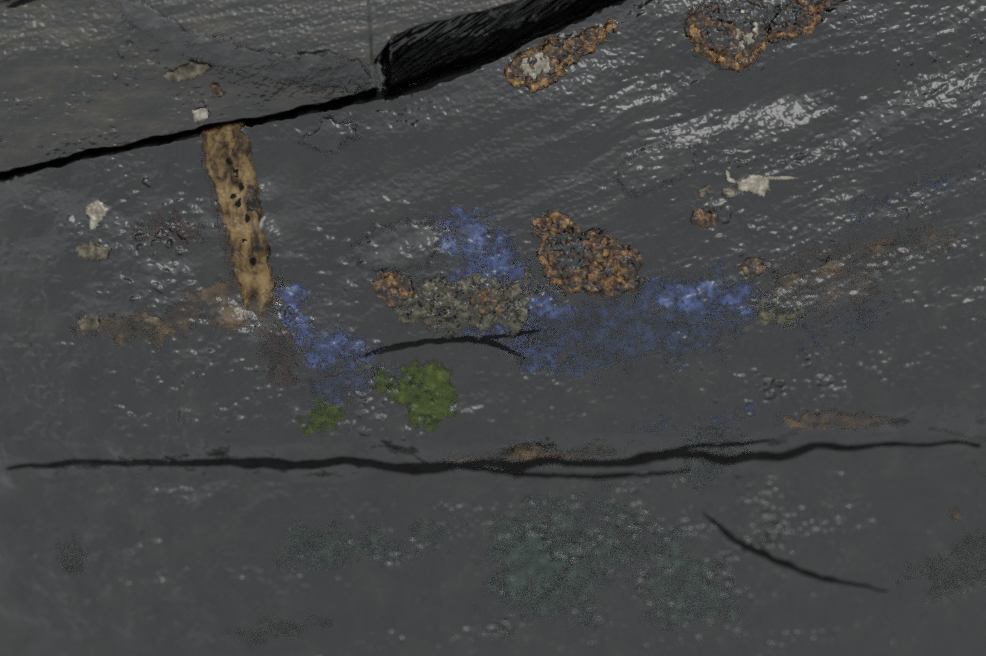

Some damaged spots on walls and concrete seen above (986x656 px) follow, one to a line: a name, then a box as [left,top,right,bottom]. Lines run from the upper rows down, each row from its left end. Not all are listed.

crack [240,0,625,128]
corrosion [504,18,618,92]
corrosion [684,0,842,72]
crack [0,126,215,180]
corrosion [69,121,284,349]
corrosion [371,270,414,308]
corrosion [531,211,646,299]
water stain [273,284,458,437]